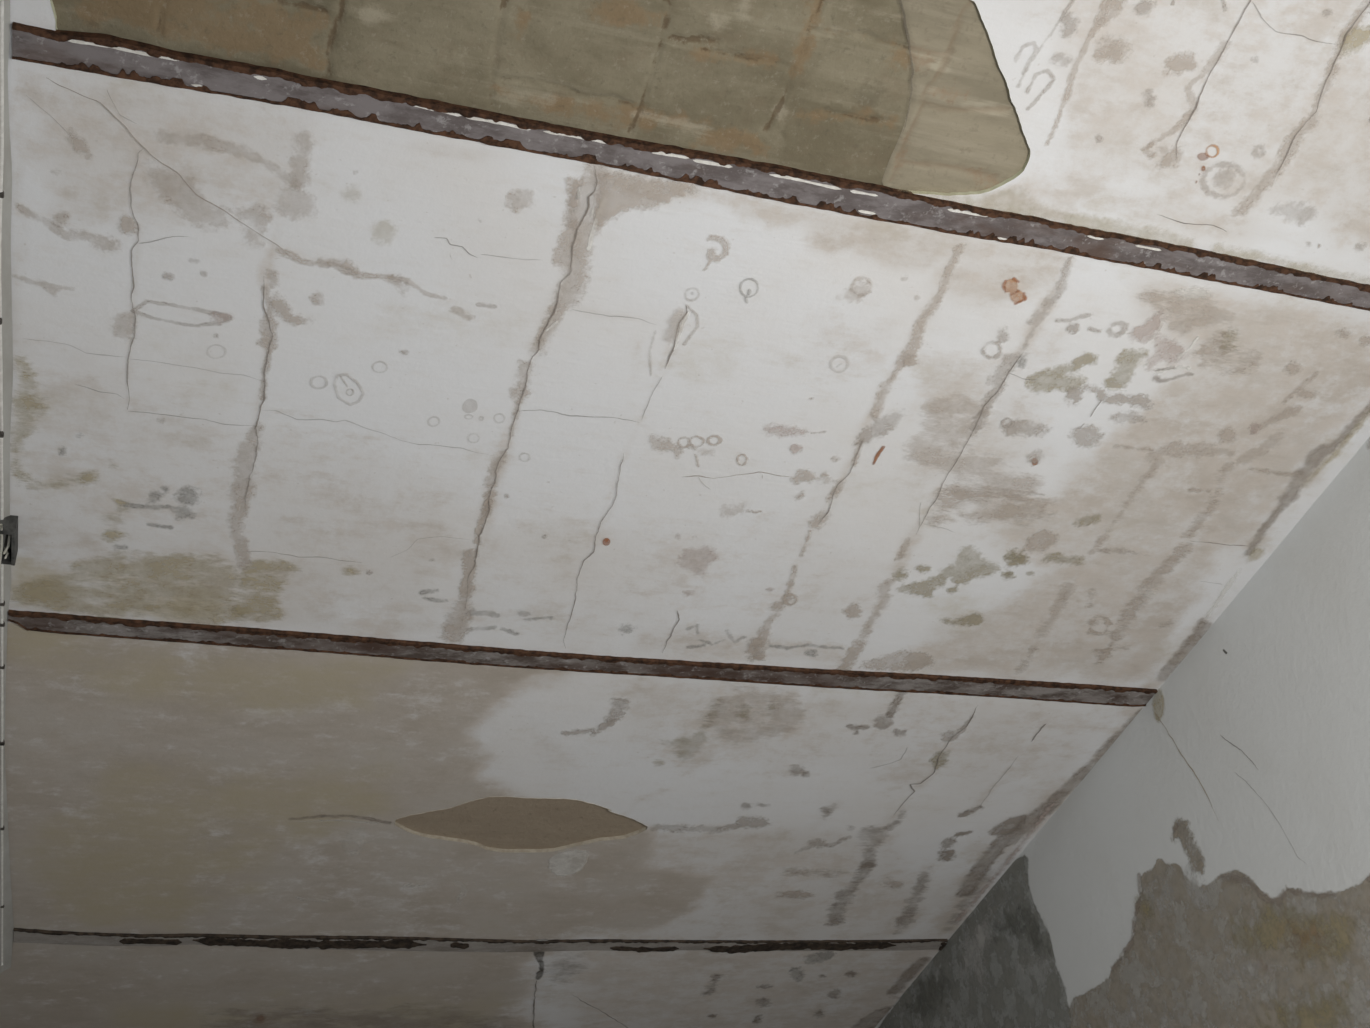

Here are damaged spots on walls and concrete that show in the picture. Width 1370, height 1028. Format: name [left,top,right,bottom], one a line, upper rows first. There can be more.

crack [49,79,293,409]
flaking render [50,0,1031,217]
corrosion [12,22,1370,311]
crack [1176,0,1251,156]
crack [245,289,273,497]
leakage [983,330,1149,407]
corrosion [8,610,1164,719]
leakage [947,614,982,626]
leakage [896,530,1061,597]
flaking render [395,797,647,875]
corrosion [13,928,948,954]
peeling [879,818,1370,1028]